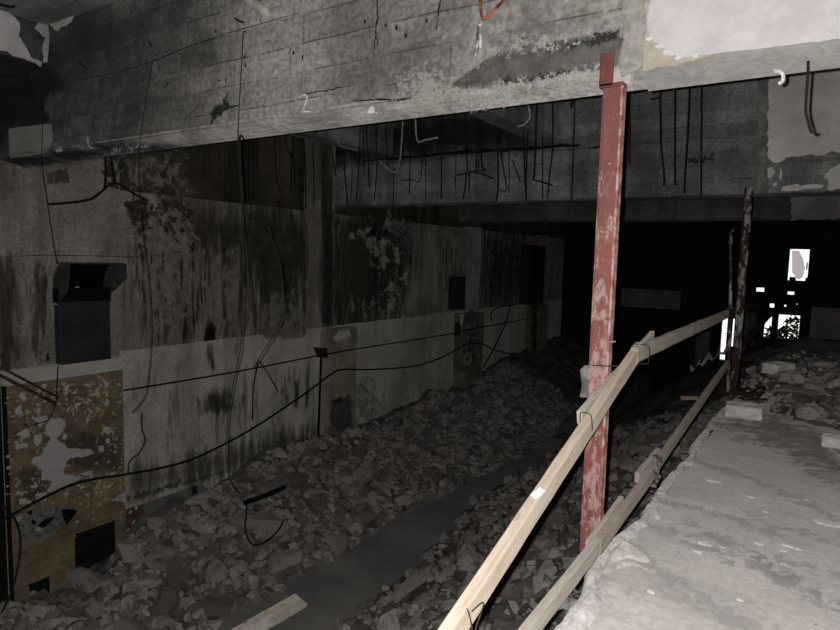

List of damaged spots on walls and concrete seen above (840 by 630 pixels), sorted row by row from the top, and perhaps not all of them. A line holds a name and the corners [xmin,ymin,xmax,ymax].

flaking render [0,10,50,67]
crack [372,0,380,54]
damp [391,60,551,157]
spalling [453,25,624,95]
flaking render [642,3,713,72]
flaking render [767,68,840,191]
damp [123,199,308,345]
damp [320,144,412,325]
peeling [5,373,145,547]
damp [132,379,317,492]